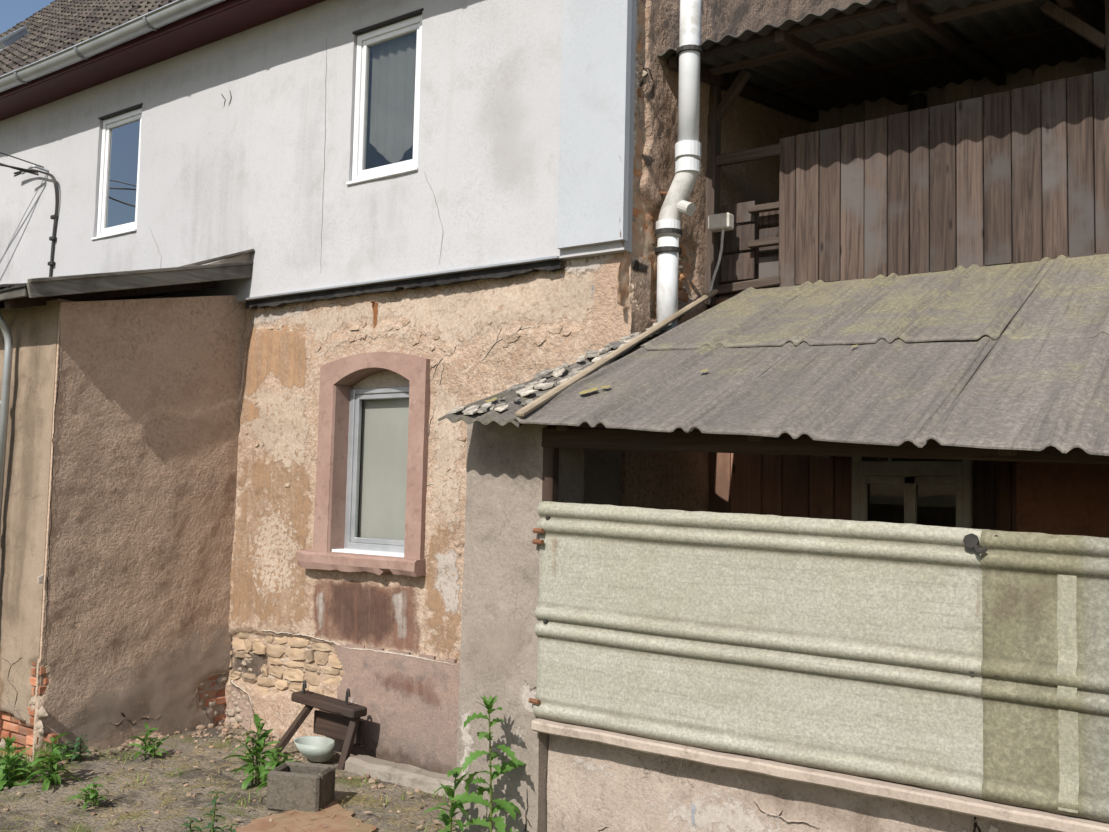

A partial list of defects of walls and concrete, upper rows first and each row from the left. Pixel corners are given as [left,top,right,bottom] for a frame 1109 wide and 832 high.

spalling [678,241,708,315]
peeling [229,0,661,653]
crack [2,321,61,720]
leakage [314,581,419,650]
flaking render [0,662,58,758]
crack [753,800,820,829]
crack [970,816,981,832]